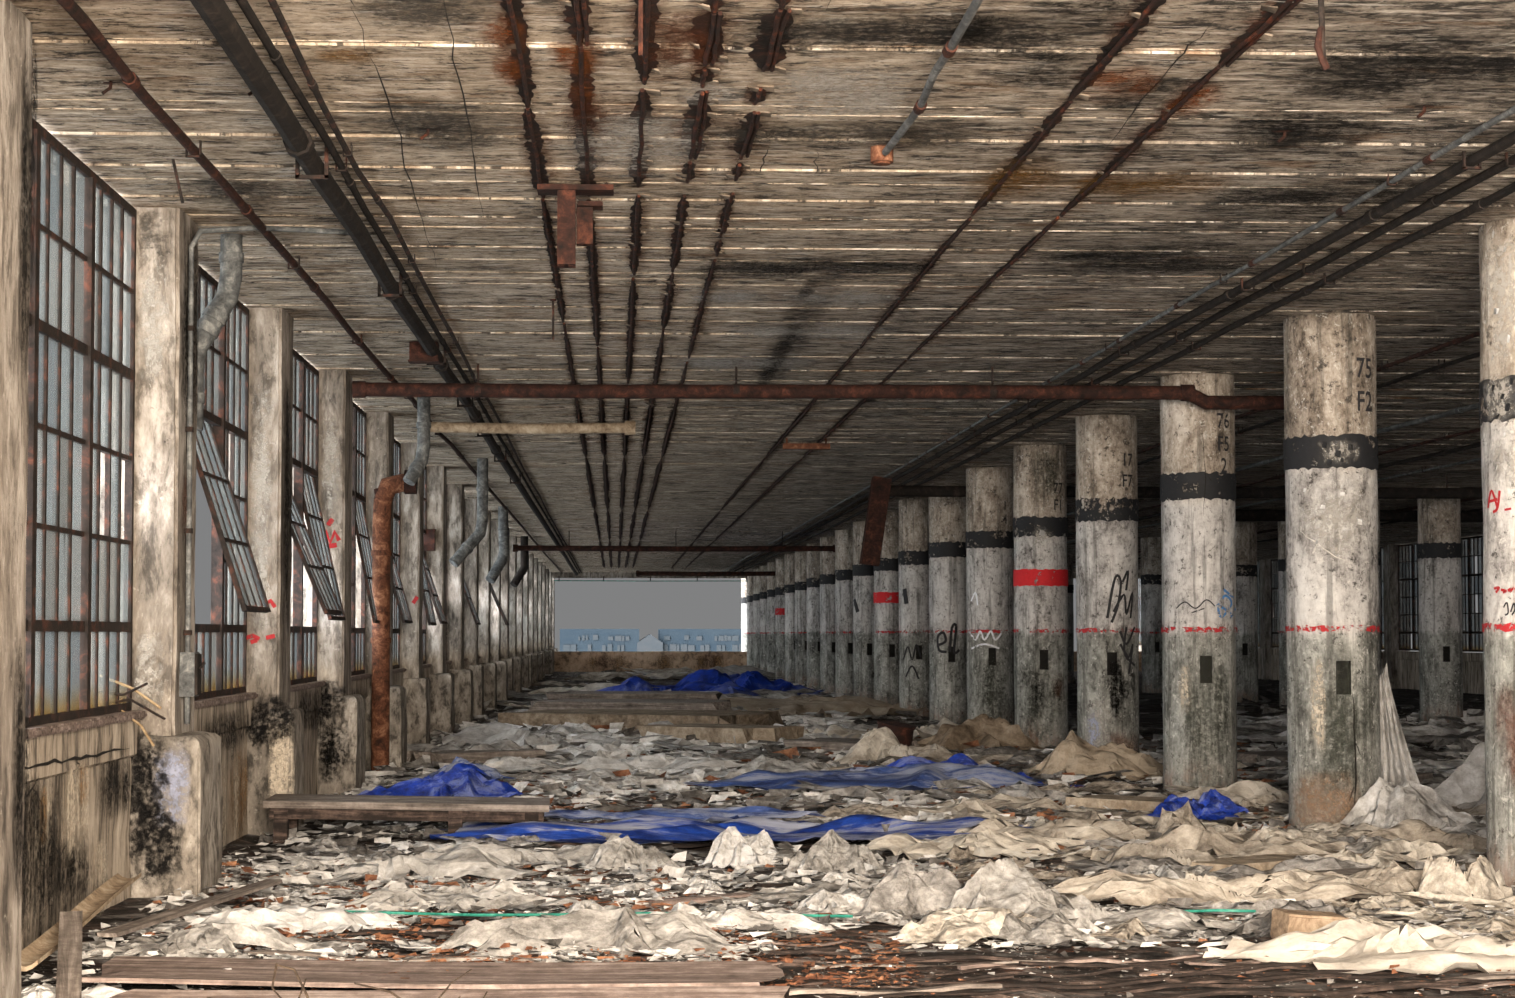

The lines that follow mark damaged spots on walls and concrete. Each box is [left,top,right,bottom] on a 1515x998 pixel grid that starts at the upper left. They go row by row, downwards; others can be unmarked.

rust [551,45,619,131]
damp [1235,35,1515,152]
damp [14,654,188,941]
damp [208,688,349,846]
damp [1312,665,1370,780]